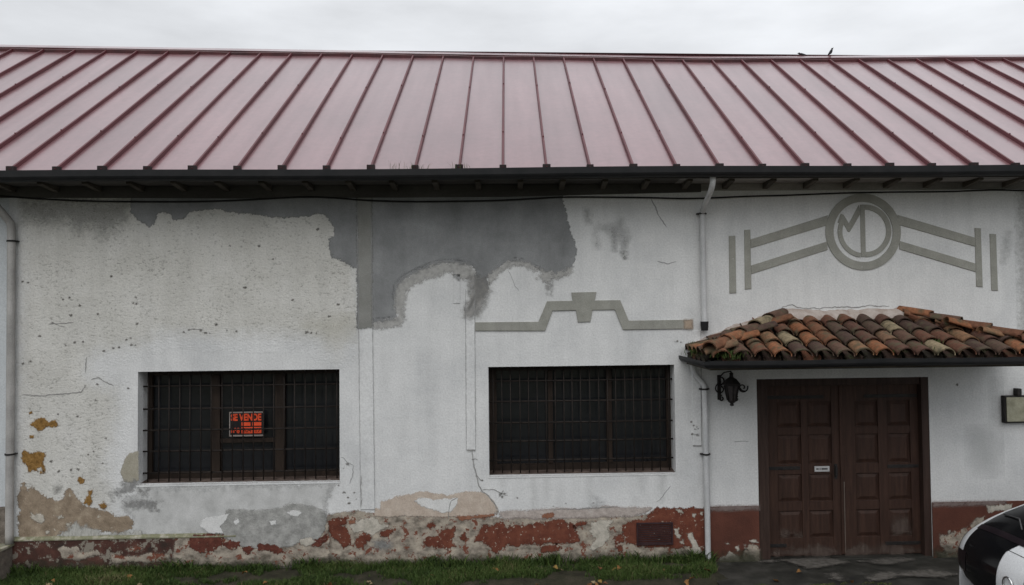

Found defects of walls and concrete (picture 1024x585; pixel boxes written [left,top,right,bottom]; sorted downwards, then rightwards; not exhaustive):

peeling [130,195,577,329]
flaking render [17,480,705,567]
crack [472,454,505,512]
peeling [939,504,1012,554]